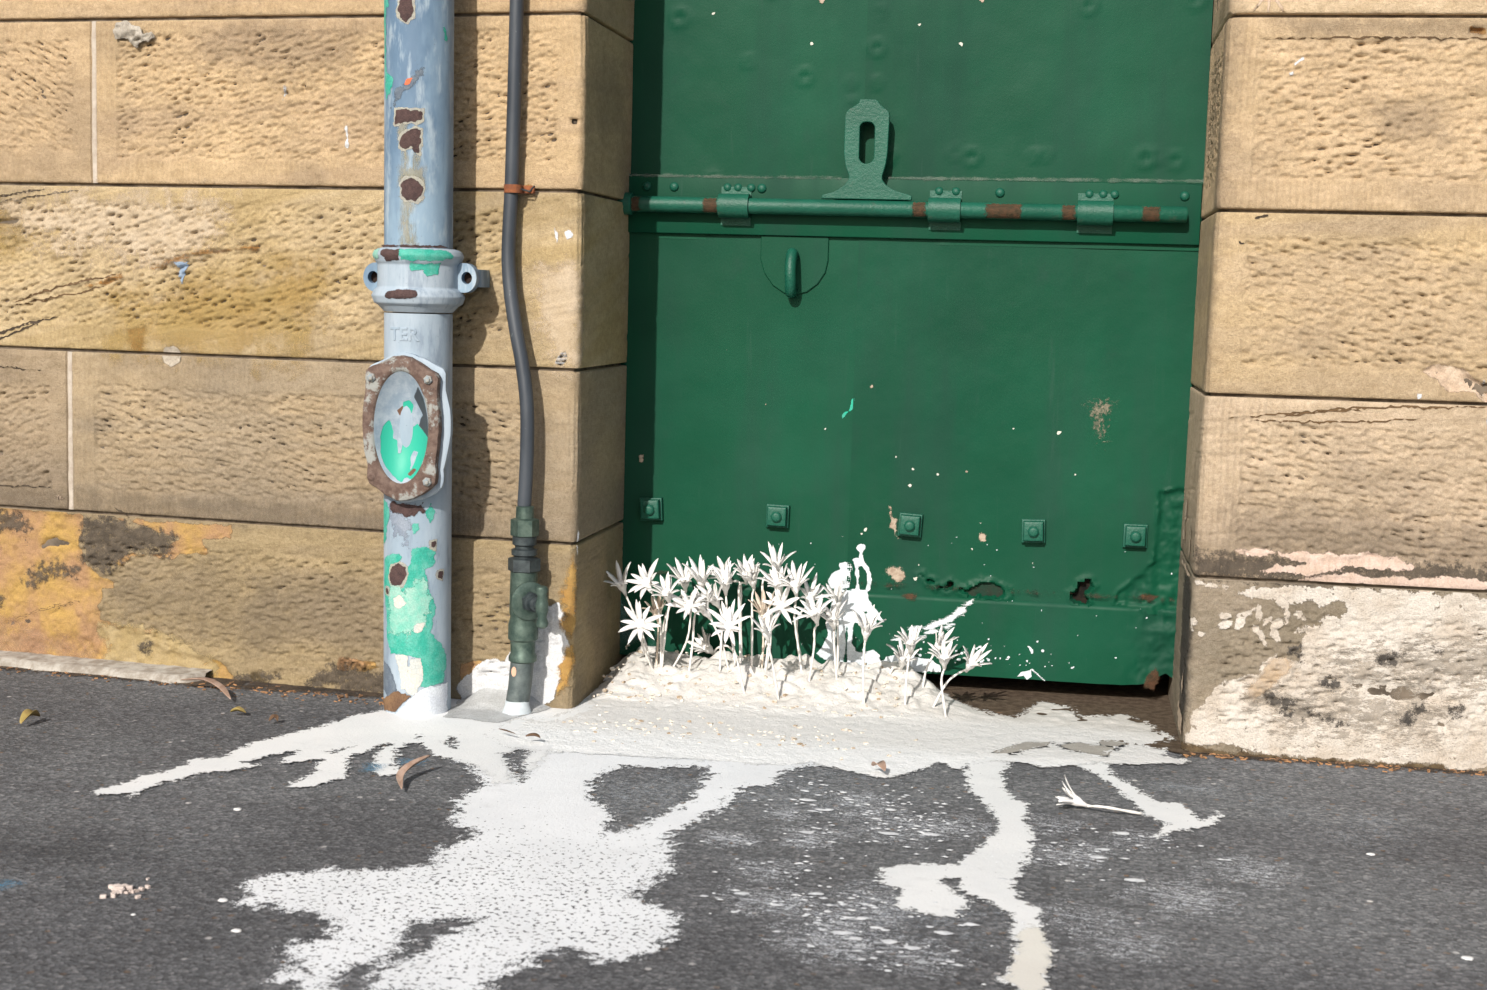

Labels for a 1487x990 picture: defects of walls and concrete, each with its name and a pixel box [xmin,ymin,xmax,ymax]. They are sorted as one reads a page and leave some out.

rust [397,0,414,22]
rust [395,109,423,153]
crack [0,189,78,204]
rust [400,178,424,201]
rust [702,198,717,213]
rust [912,202,926,217]
rust [985,203,1022,219]
rust [1061,205,1076,220]
peeling [1183,548,1487,771]